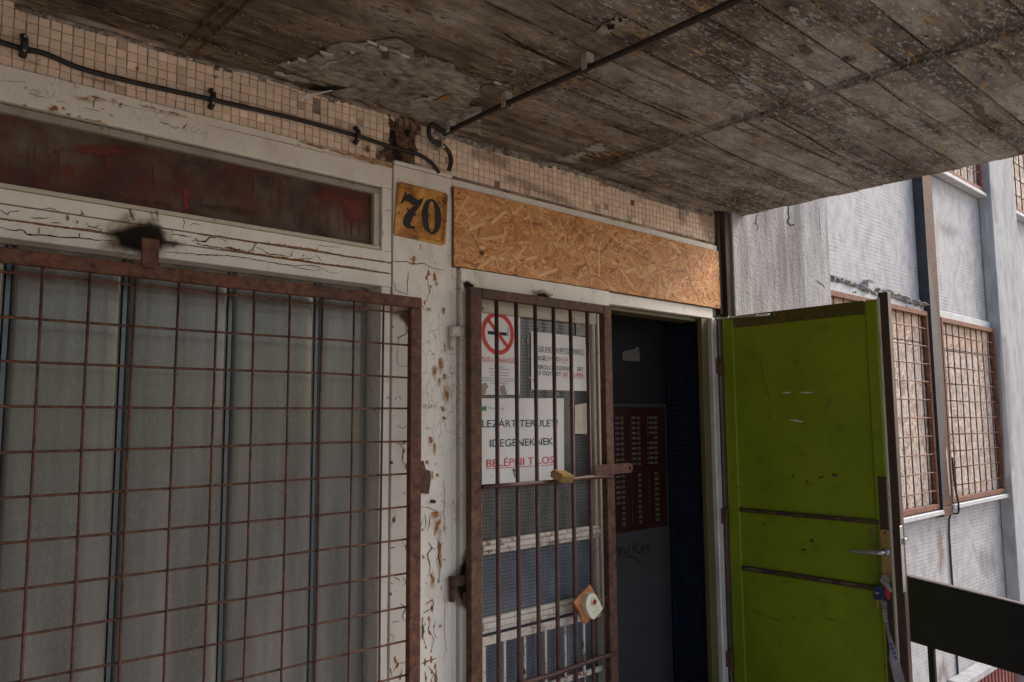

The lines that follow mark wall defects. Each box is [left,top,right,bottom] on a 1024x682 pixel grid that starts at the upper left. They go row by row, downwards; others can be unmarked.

spalling [15,4,713,216]
crack [0,208,115,242]
crack [166,218,341,273]
crack [392,245,439,305]
corrosion [433,345,449,419]